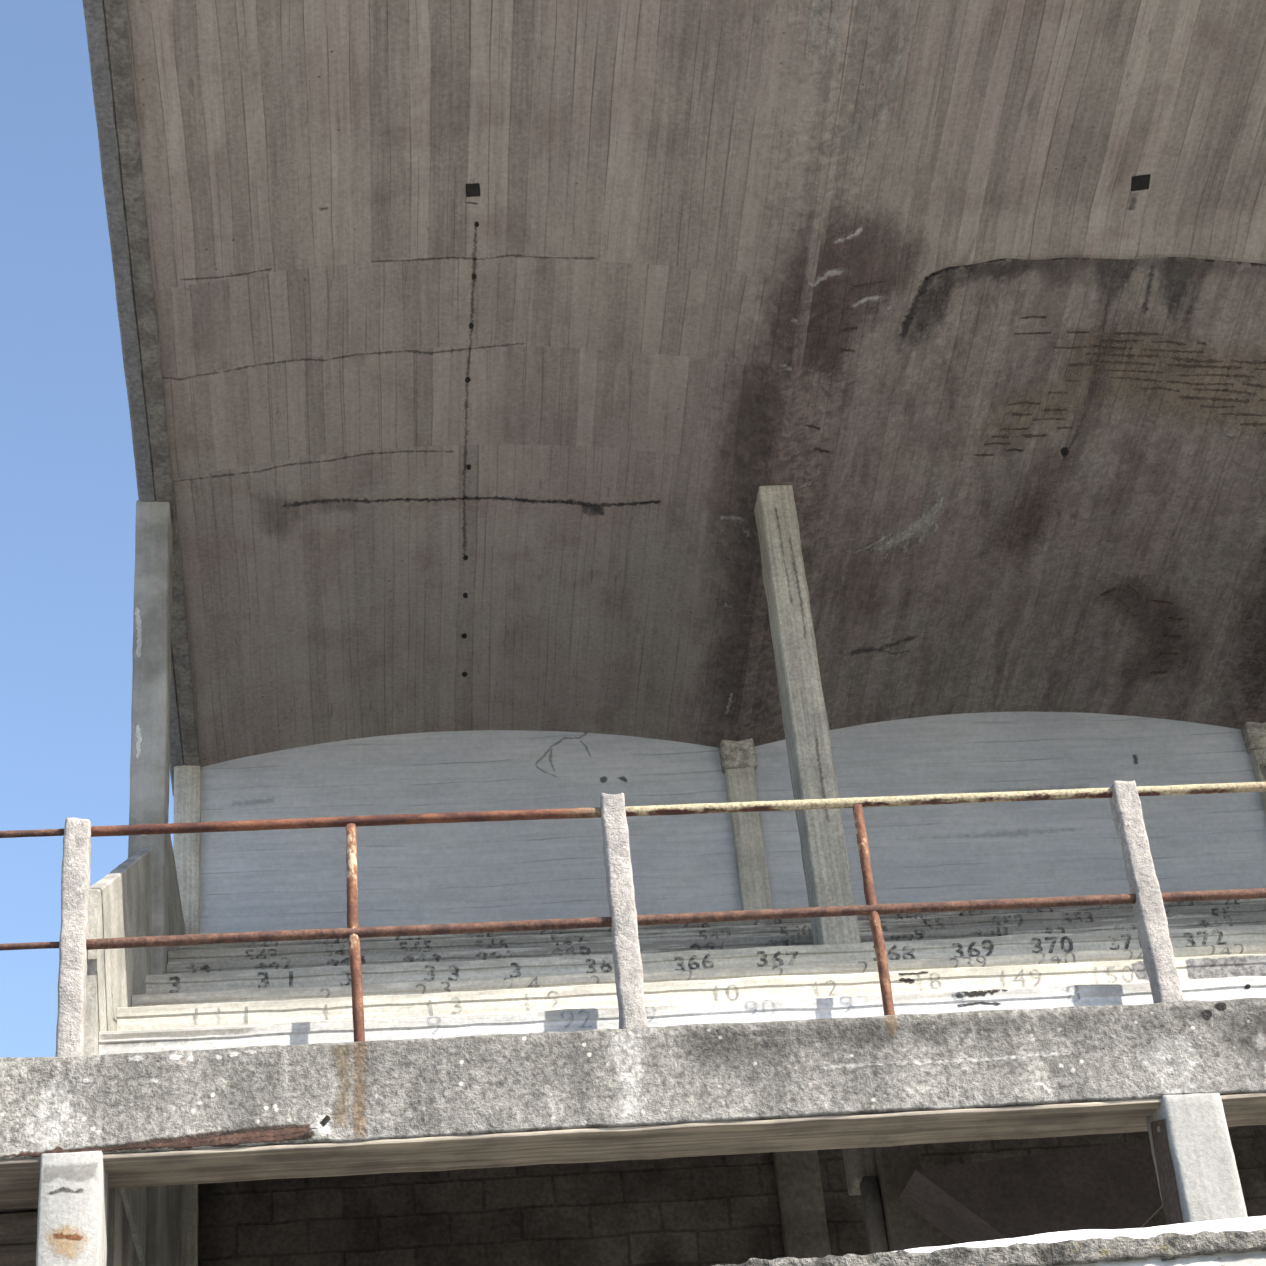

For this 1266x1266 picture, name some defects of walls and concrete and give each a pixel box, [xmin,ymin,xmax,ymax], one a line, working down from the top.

crack [900,258,1013,337]
crack [1168,257,1266,266]
crack [162,221,660,560]
spalling [975,316,1266,456]
leakage [856,492,947,560]
rust [334,1043,365,1136]
rust [48,1226,86,1258]